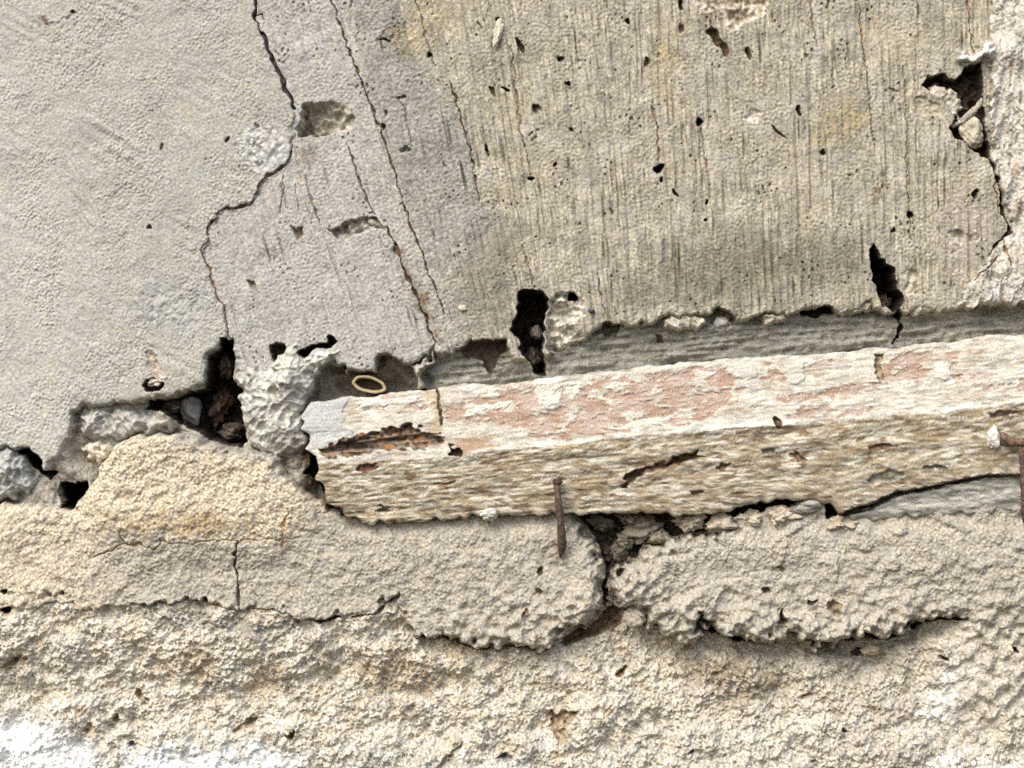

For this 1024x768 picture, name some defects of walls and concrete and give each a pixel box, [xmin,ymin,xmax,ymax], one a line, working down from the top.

crack [201,0,320,340]
spalling [235,101,358,174]
spalling [327,217,385,243]
crack [331,0,445,343]
crack [975,159,1014,281]
spalling [143,338,249,448]
spalling [269,335,338,362]
spalling [460,290,586,411]
crack [892,310,904,344]
hole [18,449,89,511]
hole [304,455,325,493]
crack [95,515,397,624]